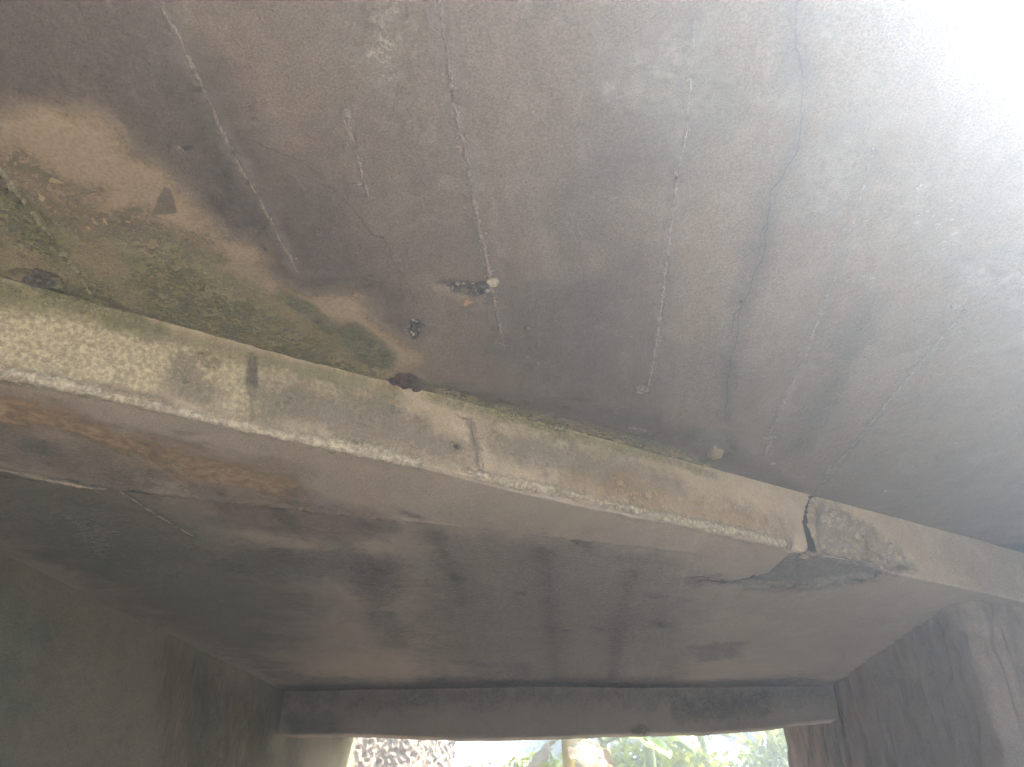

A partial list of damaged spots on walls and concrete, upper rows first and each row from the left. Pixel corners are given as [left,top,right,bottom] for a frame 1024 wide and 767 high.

peeling [0,105,428,381]
crack [724,2,804,420]
water stain [0,292,377,417]
spalling [0,364,423,468]
peeling [465,469,882,587]
crack [798,466,834,555]